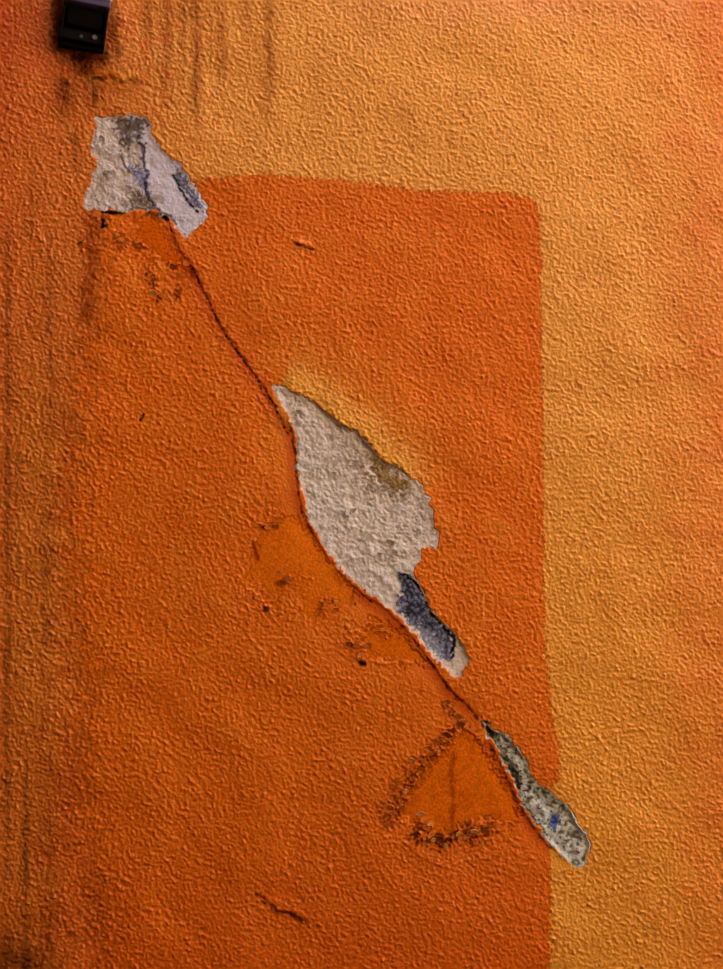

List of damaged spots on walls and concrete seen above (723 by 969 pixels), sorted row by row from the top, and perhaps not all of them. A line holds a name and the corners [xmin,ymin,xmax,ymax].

flaking render [83,114,209,298]
crack [158,212,313,531]
flaking render [238,384,470,678]
peeling [383,721,591,869]